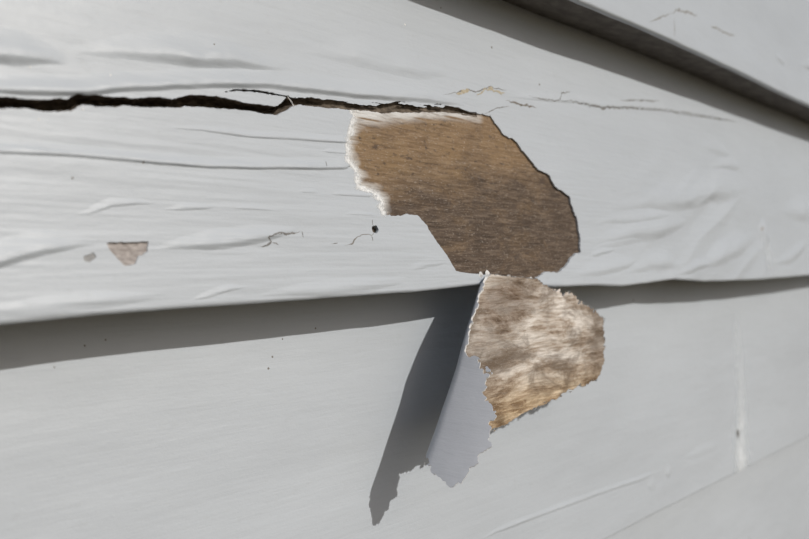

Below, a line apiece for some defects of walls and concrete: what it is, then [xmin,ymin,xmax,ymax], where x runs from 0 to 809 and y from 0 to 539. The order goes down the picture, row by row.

crack [0,86,729,120]
peeling [107,241,147,266]
peeling [345,106,606,487]